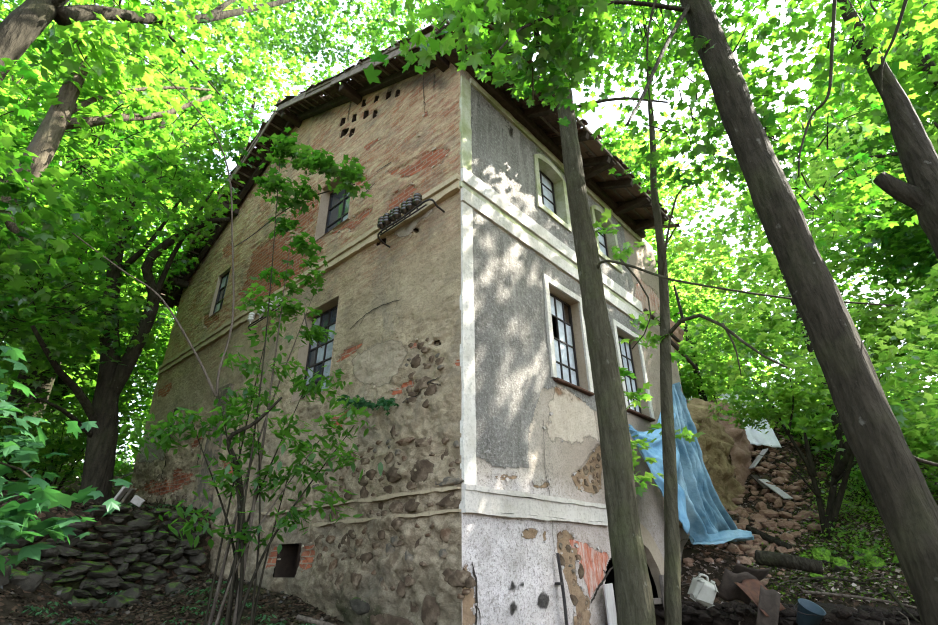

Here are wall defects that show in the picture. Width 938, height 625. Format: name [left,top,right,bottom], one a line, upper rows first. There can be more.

spalling [385,147,450,210]
peeling [335,336,445,408]
peeling [542,387,602,497]
spalling [265,547,281,568]
spalling [299,424,478,625]
crack [472,563,481,625]
peeling [521,528,546,543]
damp [538,592,549,609]
peeling [557,530,609,625]